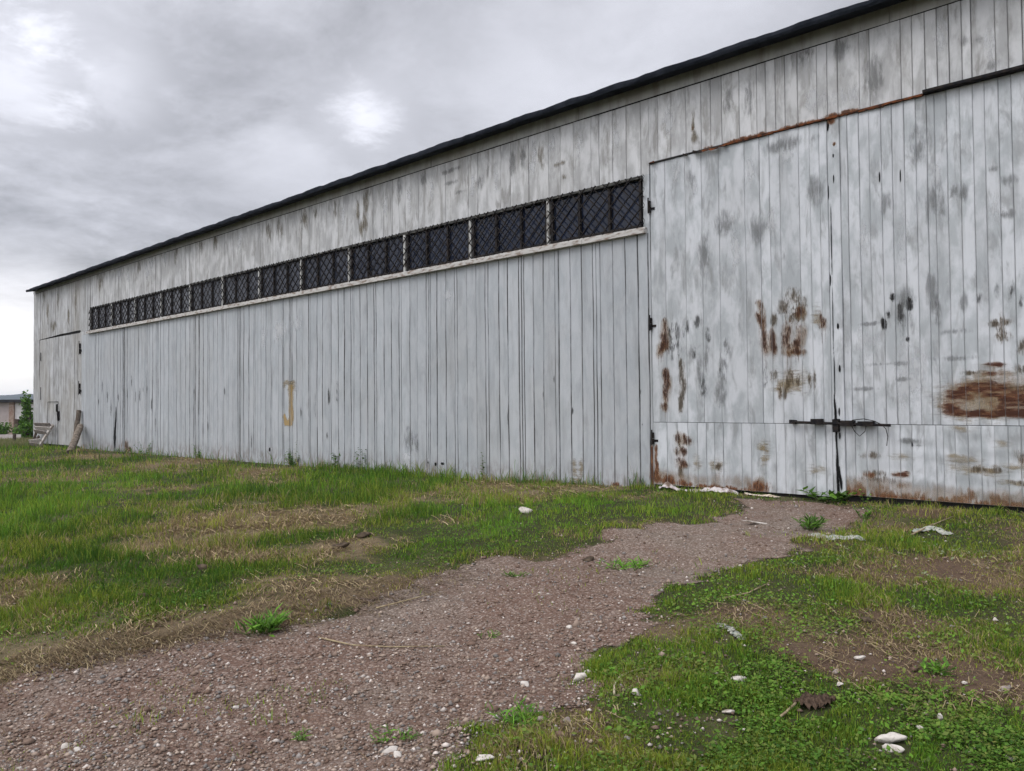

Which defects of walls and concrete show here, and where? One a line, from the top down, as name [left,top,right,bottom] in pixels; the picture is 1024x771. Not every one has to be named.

rust [780,108,859,129]
rust [658,320,679,410]
rust [756,289,826,399]
rust [941,362,1024,418]
rust [651,432,769,492]